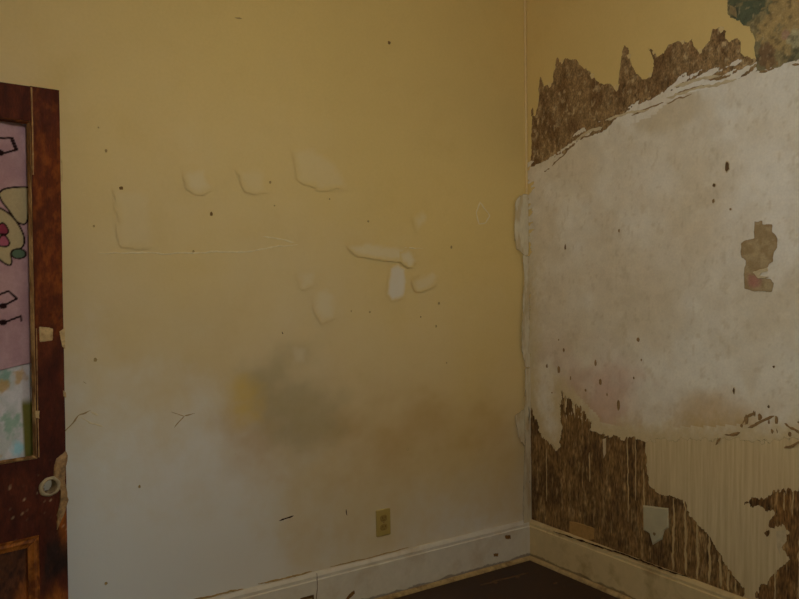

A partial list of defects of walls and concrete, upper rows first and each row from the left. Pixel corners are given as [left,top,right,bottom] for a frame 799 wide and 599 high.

leakage [200,194,532,525]
leakage [541,347,773,429]
flaking render [528,26,799,599]